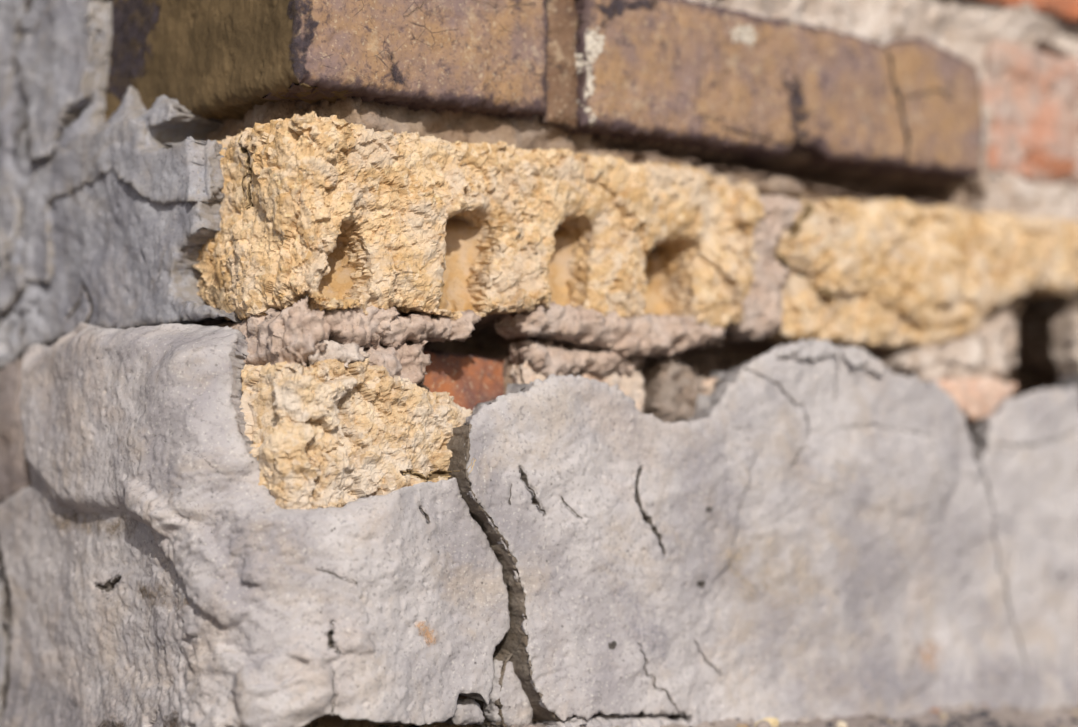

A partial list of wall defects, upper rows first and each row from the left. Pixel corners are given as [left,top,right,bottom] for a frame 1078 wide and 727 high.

crack [238,129,253,208]
spalling [0,0,1078,398]
crack [882,38,956,161]
spalling [239,358,473,510]
crack [402,424,583,727]
crack [635,466,666,555]